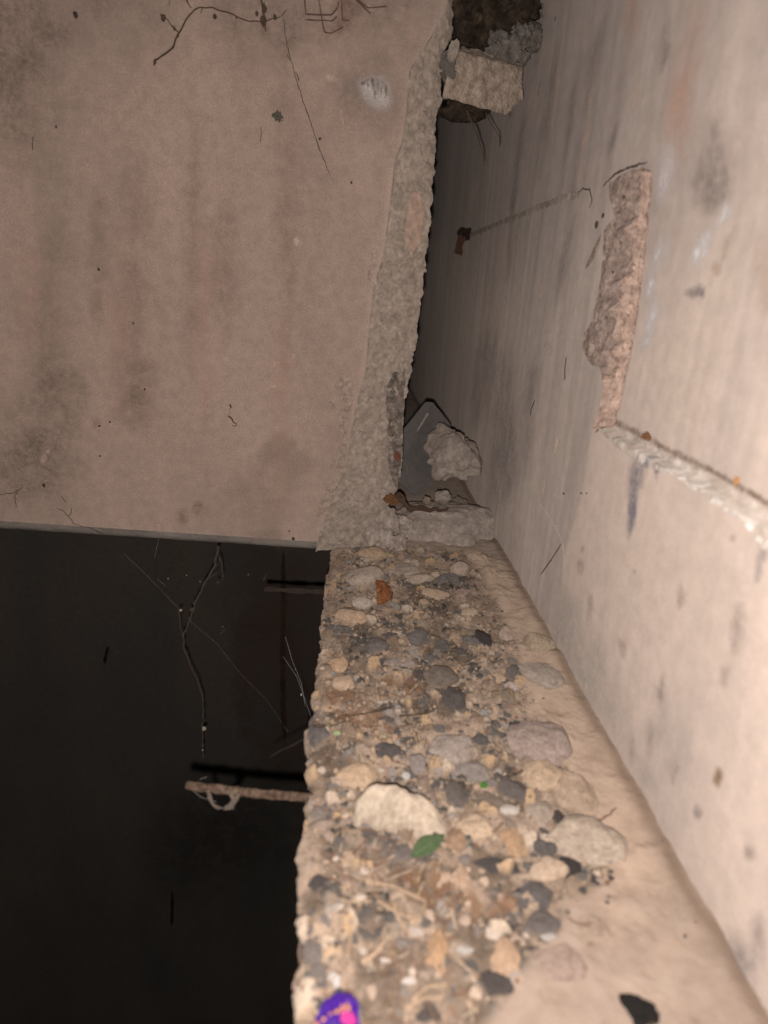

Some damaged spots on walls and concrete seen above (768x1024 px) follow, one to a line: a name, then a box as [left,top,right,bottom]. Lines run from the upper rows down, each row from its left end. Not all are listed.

crack [283,18,333,181]
spalling [315,0,456,552]
spalling [582,168,768,551]
spalling [352,596,374,610]
spalling [491,673,519,690]
peeling [500,804,520,816]
spalling [540,933,558,942]
peeling [455,945,475,957]
spalling [327,971,341,989]